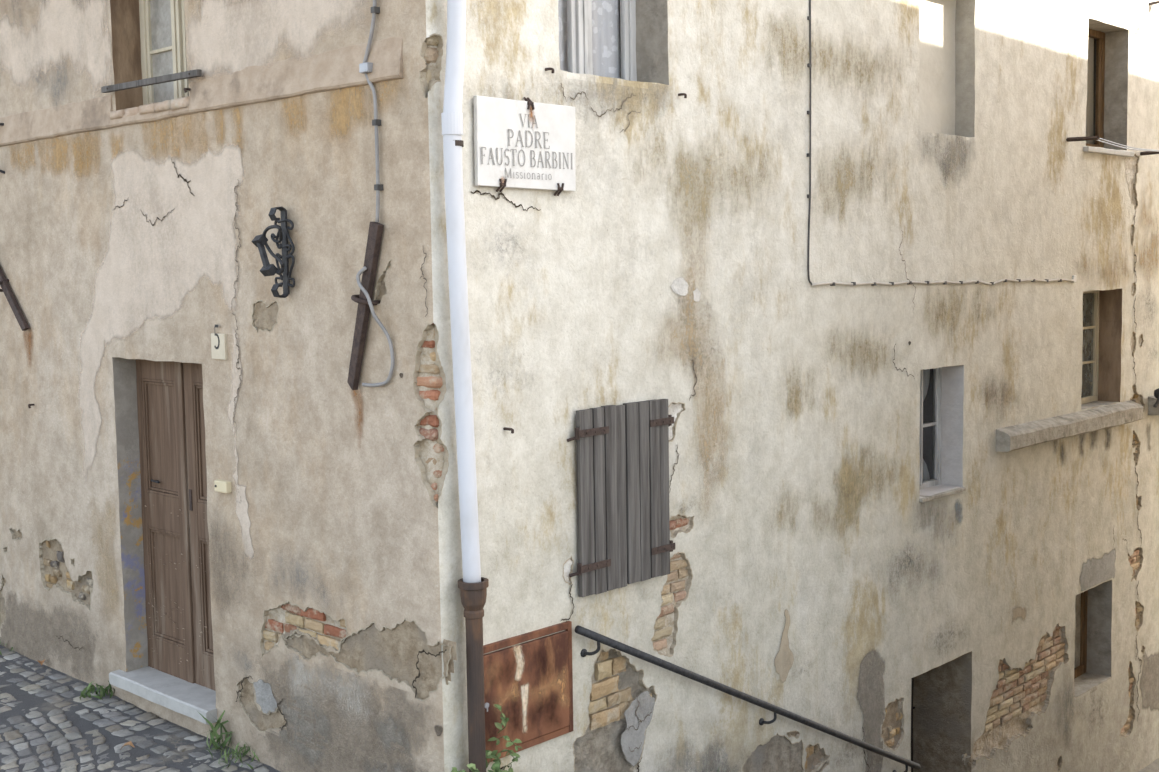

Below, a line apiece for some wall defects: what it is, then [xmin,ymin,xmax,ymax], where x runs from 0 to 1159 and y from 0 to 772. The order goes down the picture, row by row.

crack [115,159,194,226]
flaking render [413,323,449,508]
flaking render [0,574,94,672]
flaking render [38,538,93,610]
flaking render [236,678,286,733]
flaking render [259,601,457,702]
flaking render [572,647,657,772]
flaking render [651,552,693,657]
flaking render [670,513,695,538]
flaking render [742,730,830,772]
flaking render [881,697,905,751]
flaking render [961,623,1069,769]